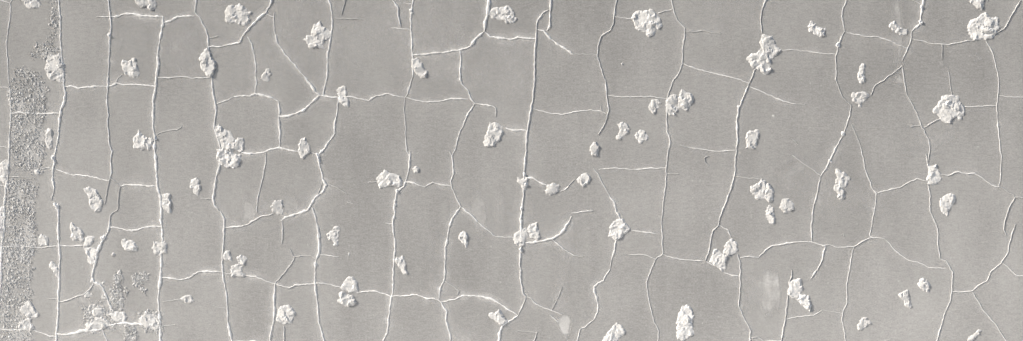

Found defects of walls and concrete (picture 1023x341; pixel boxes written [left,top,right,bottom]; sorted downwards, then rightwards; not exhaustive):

spalling [631,9,662,37]
spalling [967,0,1000,41]
spalling [746,34,782,75]
spalling [648,89,694,116]
spalling [932,95,965,124]
spalling [215,124,245,169]
spalling [376,169,403,189]
crack [0,0,805,341]
crack [725,0,1023,341]
spalling [337,276,359,307]
spalling [787,278,812,312]
spalling [676,304,695,341]